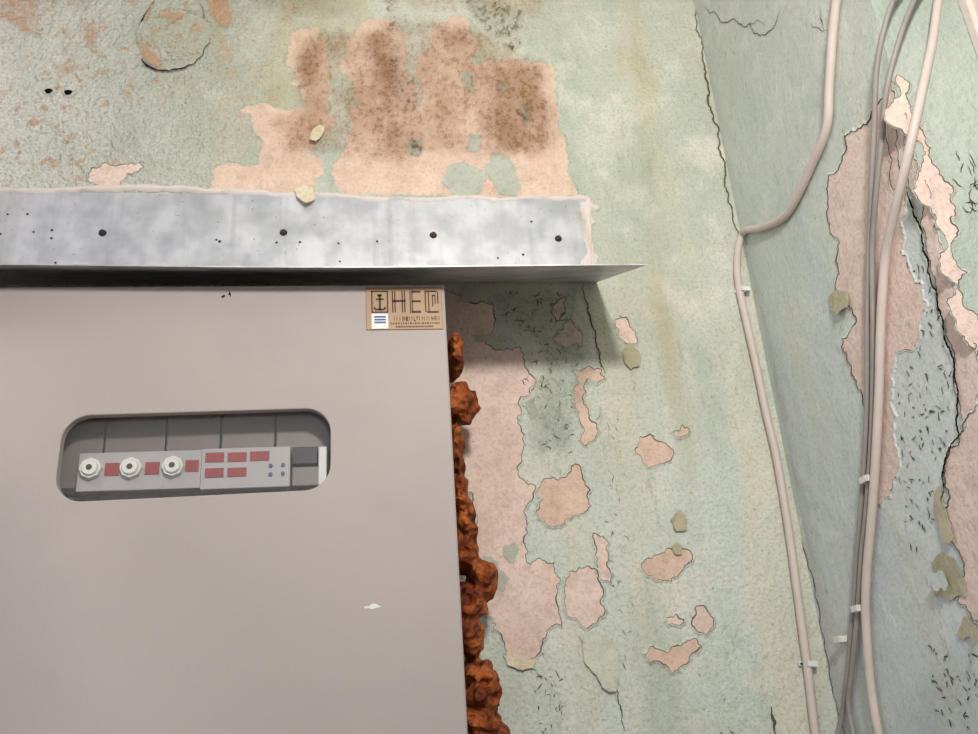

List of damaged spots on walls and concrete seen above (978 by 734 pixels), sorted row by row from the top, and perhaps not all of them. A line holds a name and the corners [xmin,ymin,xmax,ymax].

peeling [207,14,579,203]
crack [695,9,780,233]
peeling [444,289,615,670]
peeling [612,315,641,369]
peeling [632,423,691,470]
peeling [639,510,695,584]
peeling [642,603,716,676]
peeling [826,74,978,646]
crack [885,133,960,553]